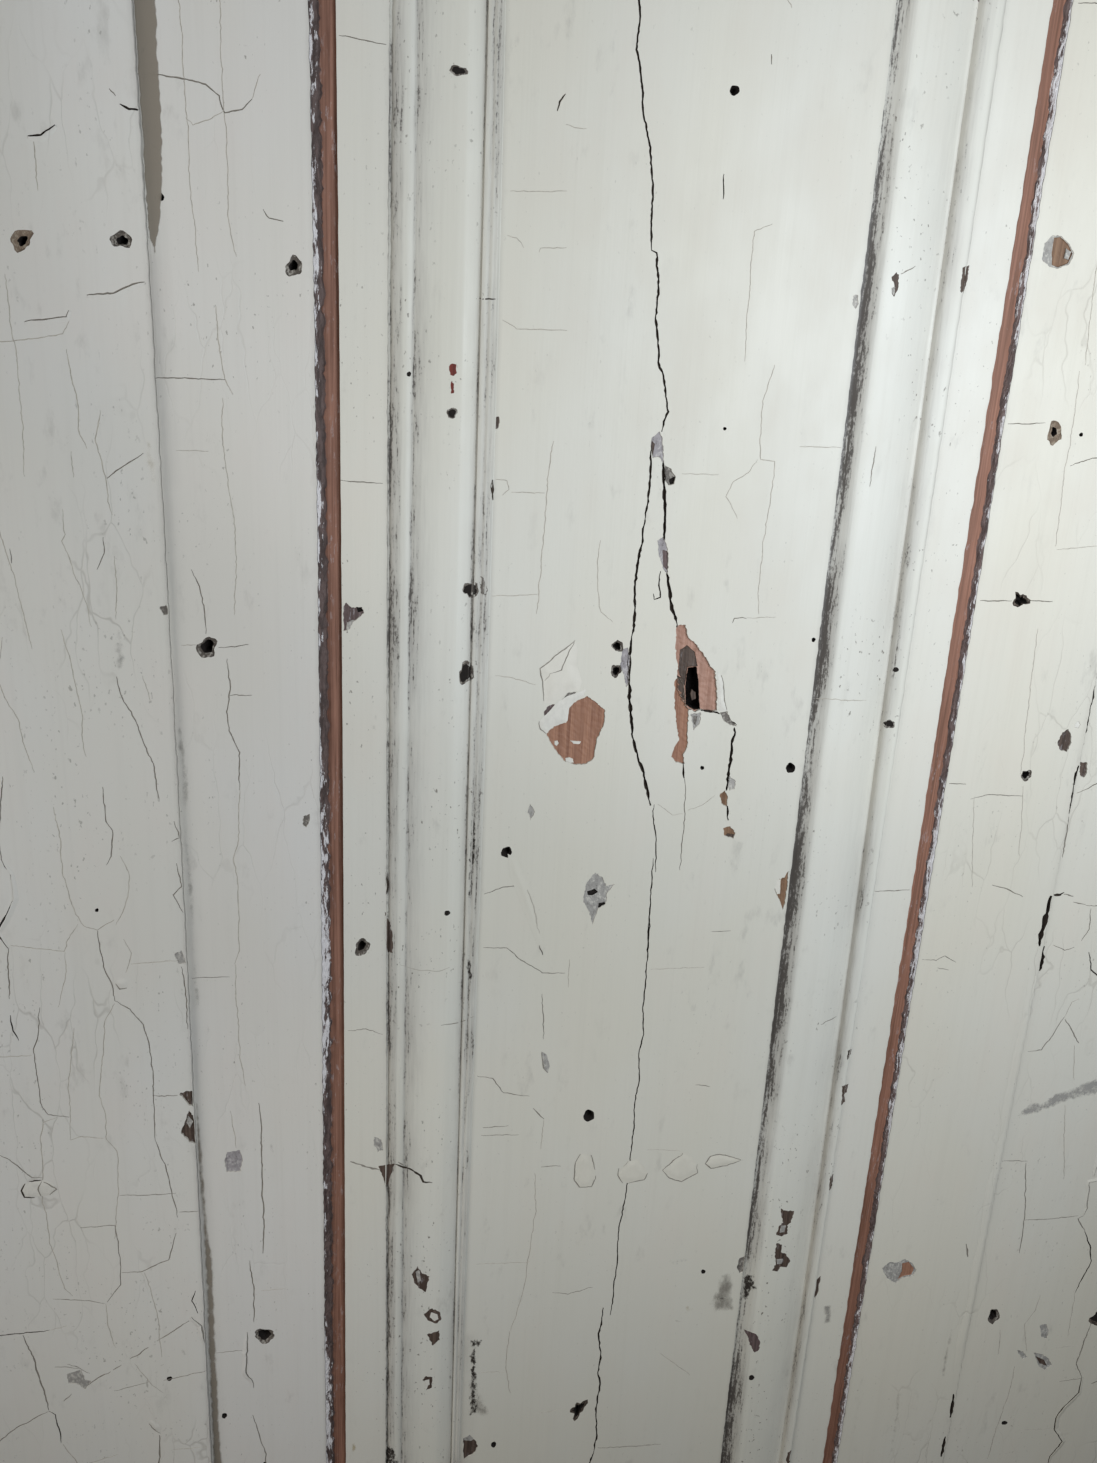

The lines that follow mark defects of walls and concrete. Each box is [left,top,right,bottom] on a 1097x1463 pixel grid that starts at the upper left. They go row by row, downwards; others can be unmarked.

crack [28,125,57,190]
crack [158,0,260,272]
crack [1055,267,1097,550]
crack [0,278,286,1463]
peeling [539,690,605,765]
peeling [583,873,615,924]
crack [476,0,841,1463]
spalling [671,625,736,768]
spalling [831,0,1074,1463]
crack [949,600,1097,1078]
crack [940,1394,954,1456]
crack [987,1115,1097,1463]